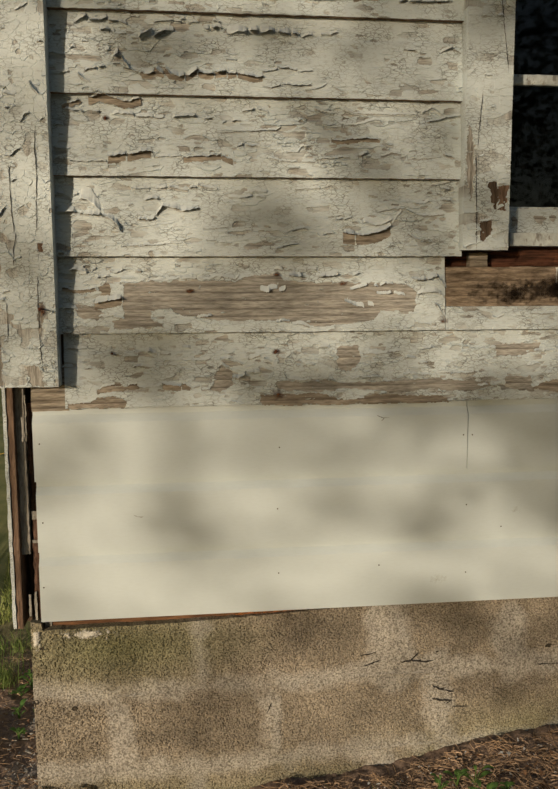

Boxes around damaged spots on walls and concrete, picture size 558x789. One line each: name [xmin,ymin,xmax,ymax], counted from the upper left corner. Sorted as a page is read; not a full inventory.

peeling [73,12,126,32]
peeling [138,14,298,37]
peeling [62,93,163,118]
peeling [331,135,381,156]
peeling [183,152,234,165]
peeling [466,126,484,199]
peeling [480,181,509,241]
peeling [343,208,445,246]
peeling [62,266,417,330]
leakage [489,277,558,302]
peeling [490,342,541,356]
peeling [260,370,558,406]